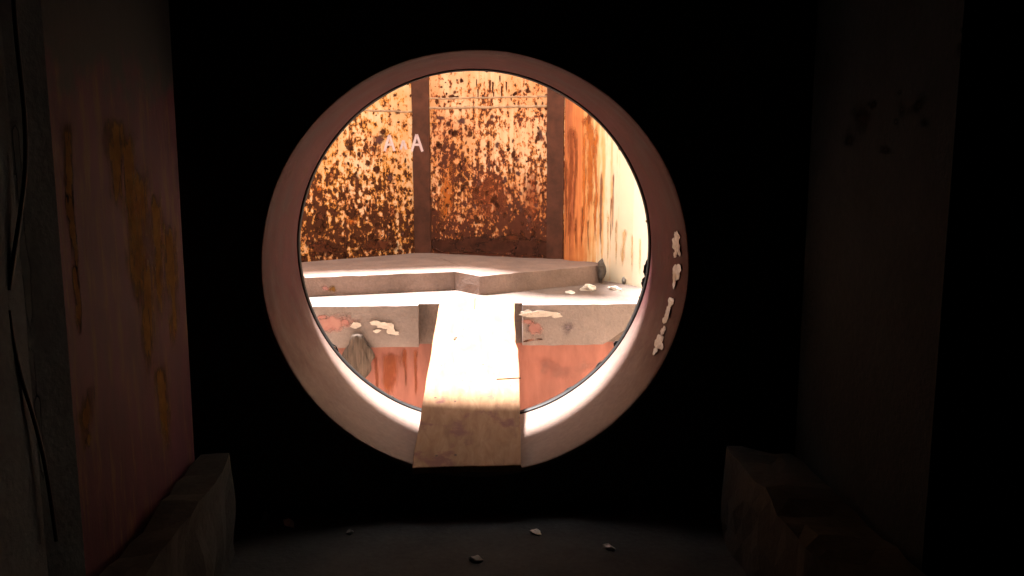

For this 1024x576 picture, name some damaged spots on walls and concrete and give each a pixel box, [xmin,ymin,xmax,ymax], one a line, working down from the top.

rust [301,94,413,262]
rust [432,76,547,258]
rust [565,116,614,244]
peeling [317,315,399,335]
spalling [519,309,562,334]
peeling [652,231,681,355]